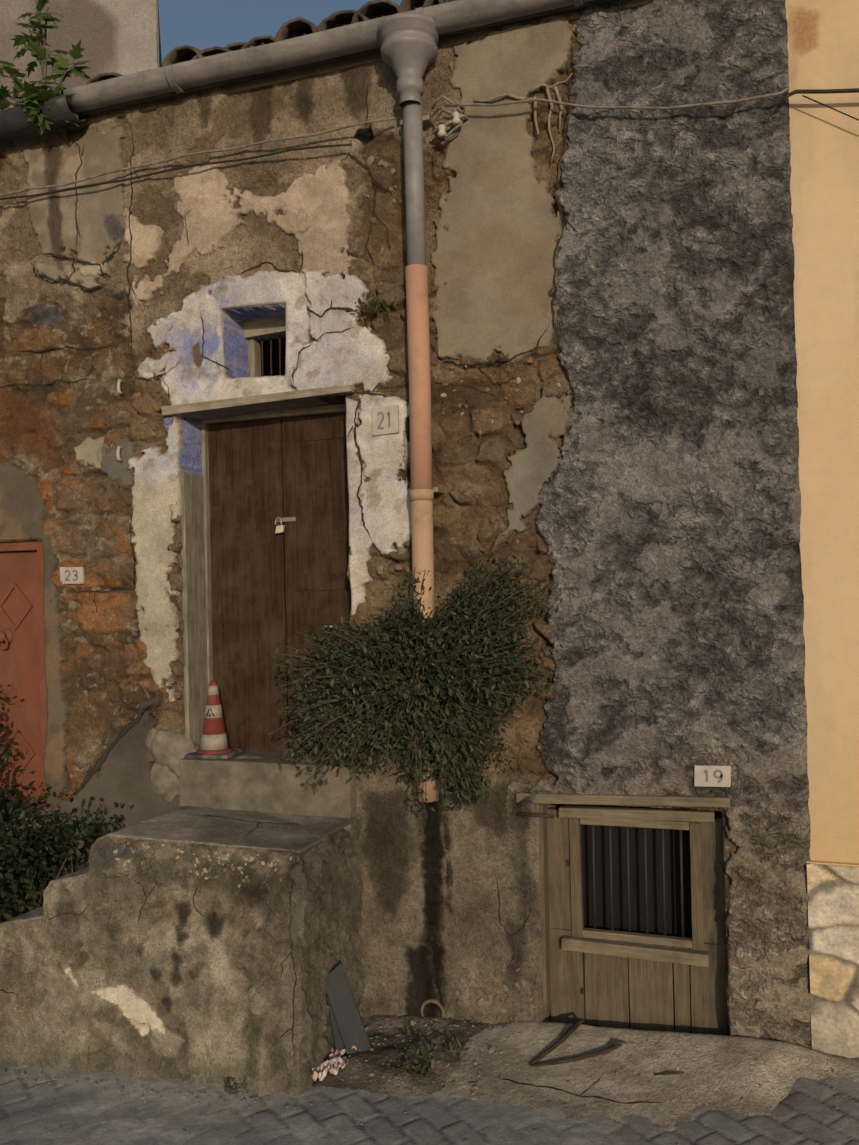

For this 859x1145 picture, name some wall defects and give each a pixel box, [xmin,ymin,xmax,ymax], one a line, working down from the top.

water stain [250,86,272,149]
water stain [341,63,370,116]
peeling [430,10,579,437]
crack [200,312,237,377]
crack [292,300,369,382]
peeling [23,125,412,702]
crack [348,381,391,550]
crack [131,879,157,921]
water stain [406,794,453,1017]
spalling [92,985,183,1055]